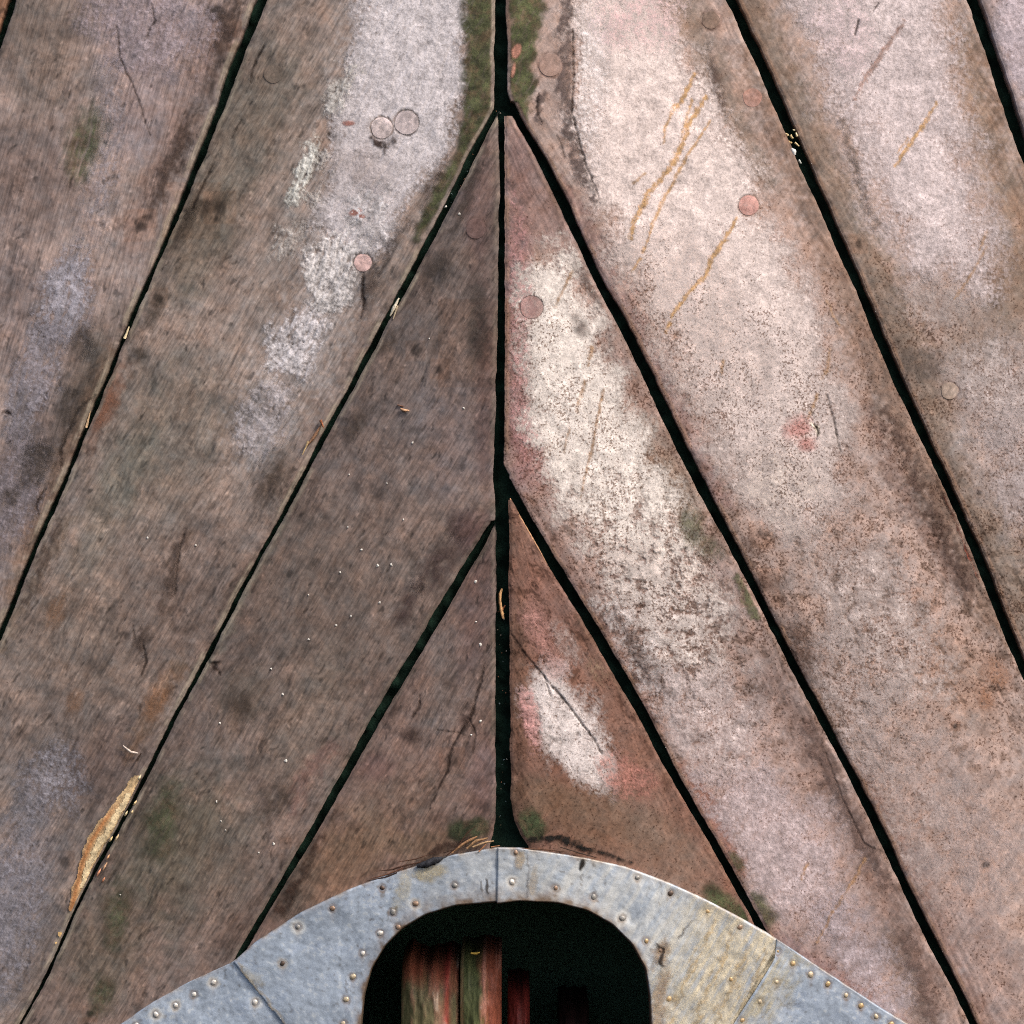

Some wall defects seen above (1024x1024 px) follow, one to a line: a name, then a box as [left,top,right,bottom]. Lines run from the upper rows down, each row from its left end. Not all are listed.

rust [630,73,709,269]
rust [895,101,937,166]
rust [666,218,737,334]
crack [433,677,482,800]
crack [514,639,602,753]
peeling [80,793,131,888]